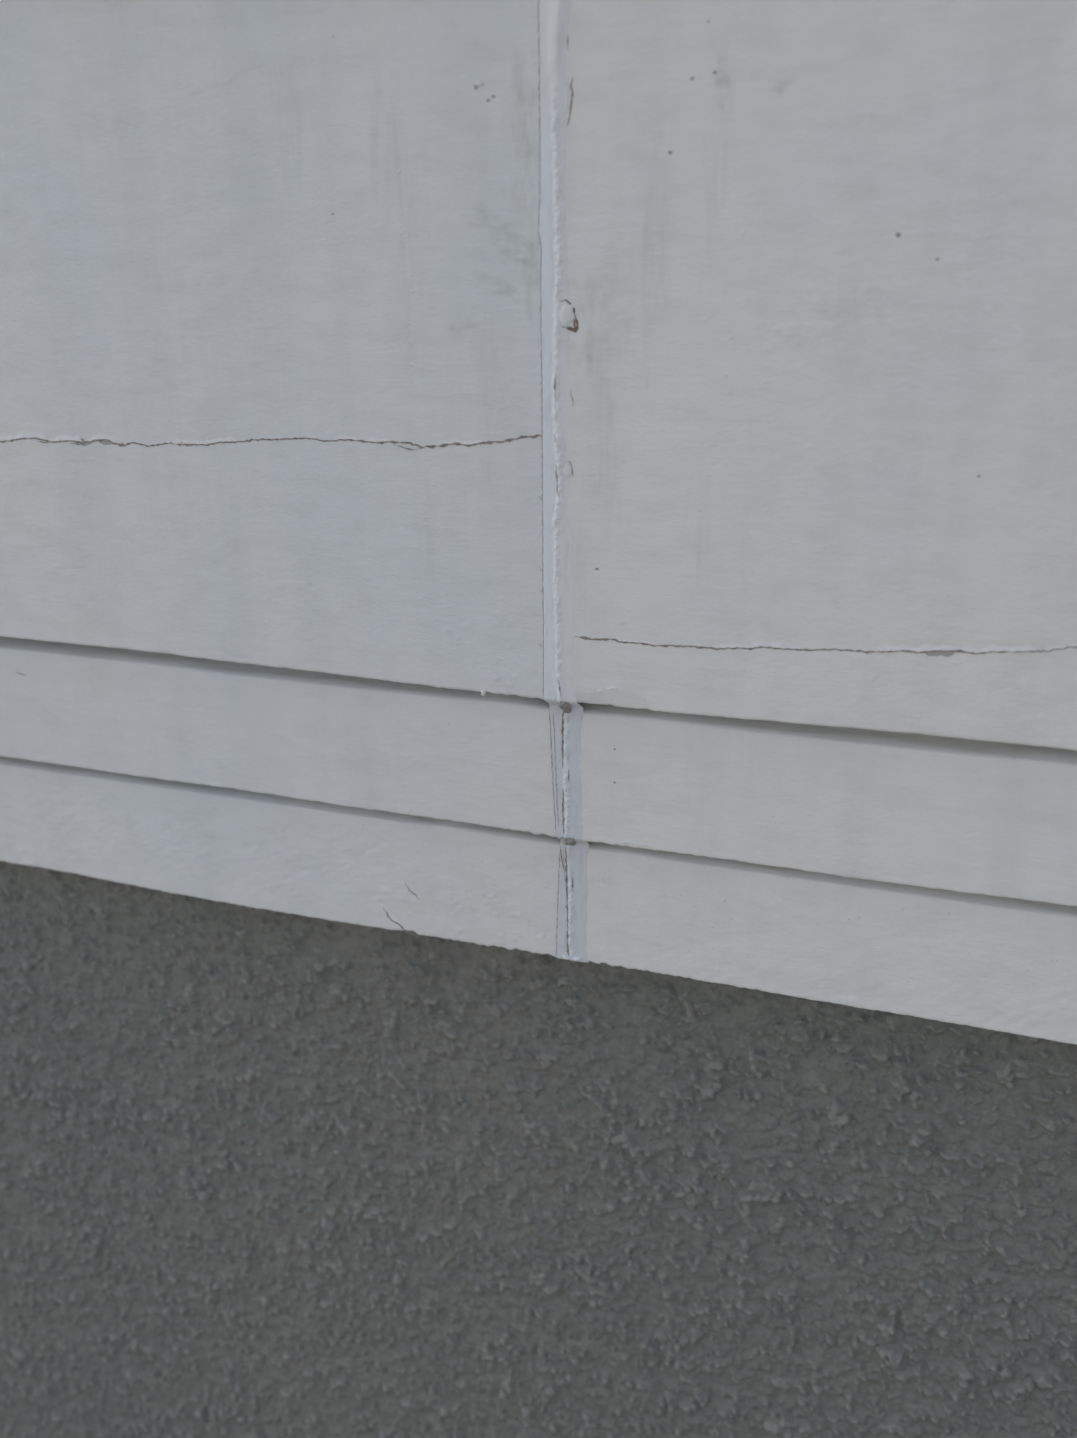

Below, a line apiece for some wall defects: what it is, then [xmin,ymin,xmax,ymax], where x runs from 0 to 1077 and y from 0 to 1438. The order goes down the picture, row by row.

crack [0,1,1077,956]